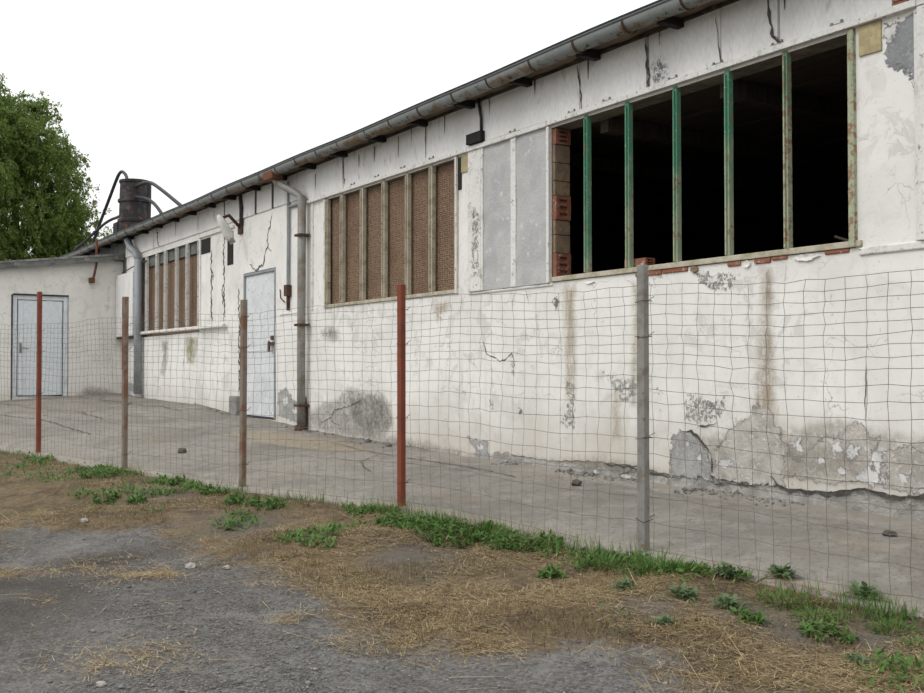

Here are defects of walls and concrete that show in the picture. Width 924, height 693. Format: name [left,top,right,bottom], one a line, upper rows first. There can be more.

crack [767,0,780,43]
spalling [883,13,914,88]
crack [250,216,272,272]
crack [210,238,240,390]
water stain [758,273,771,408]
peeling [603,372,637,401]
peeling [684,394,728,424]
spalling [668,403,924,496]
crack [683,422,924,501]